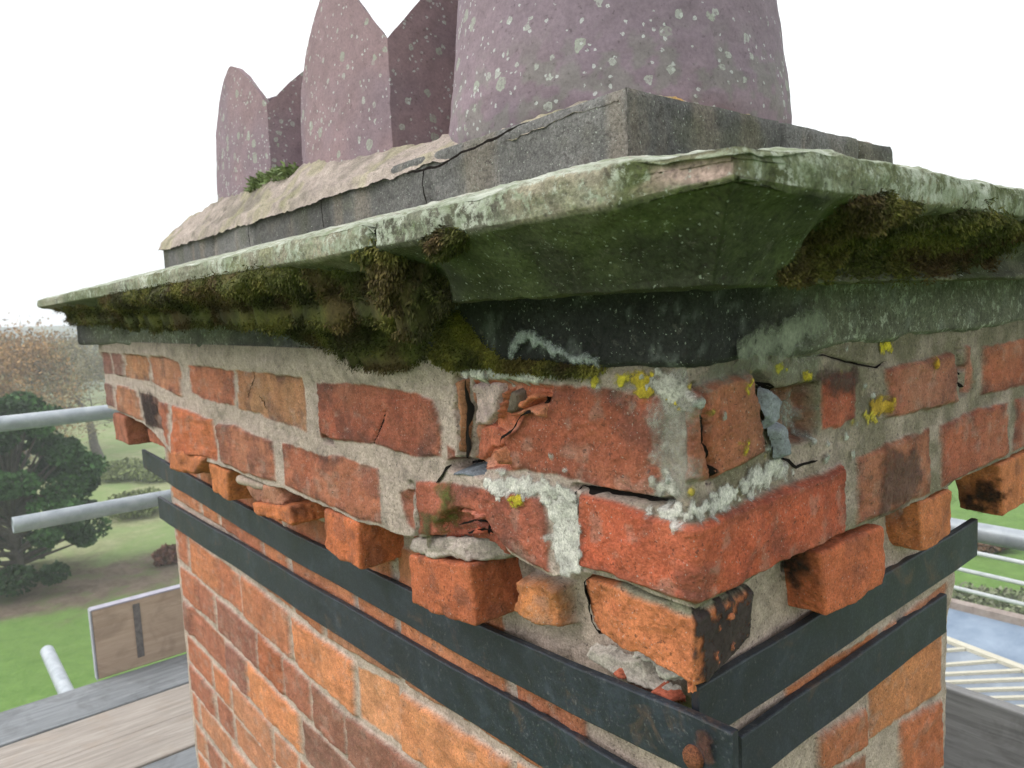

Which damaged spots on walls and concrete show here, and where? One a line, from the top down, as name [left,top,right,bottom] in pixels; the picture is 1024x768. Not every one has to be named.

crack [407,122,528,204]
crack [754,381,774,390]
crack [796,354,885,368]
spalling [455,378,554,468]
crack [699,415,718,476]
crack [781,458,818,469]
crack [575,485,676,504]
crack [584,576,603,634]